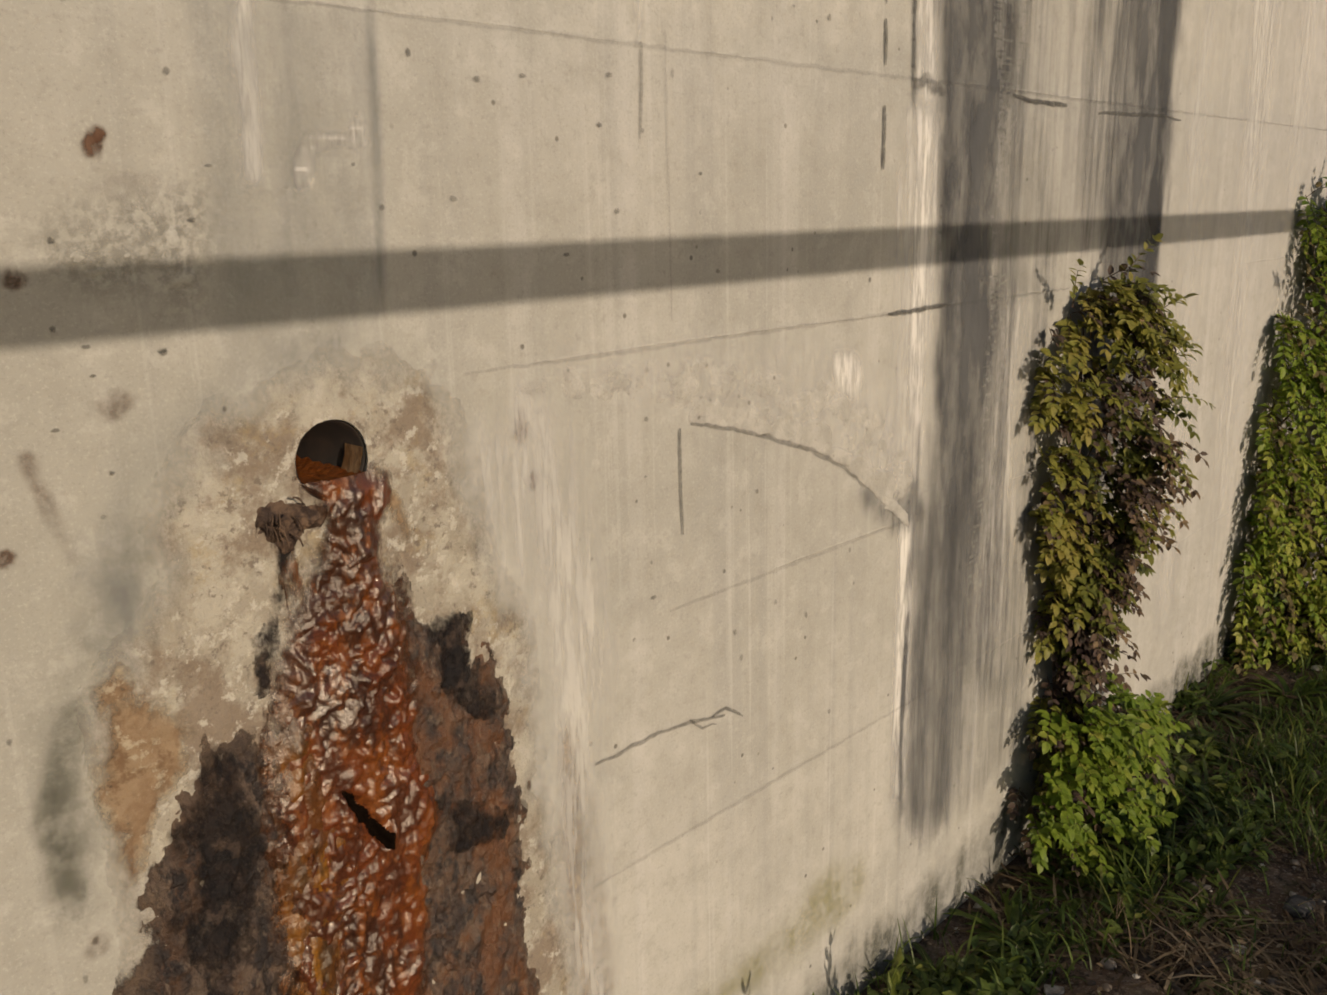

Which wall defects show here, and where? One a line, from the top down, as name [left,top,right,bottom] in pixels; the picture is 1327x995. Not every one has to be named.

rust [83,127,106,156]
water stain [1104,0,1180,301]
water stain [885,0,1020,811]
water stain [1083,305,1152,464]
rust [85,349,579,995]